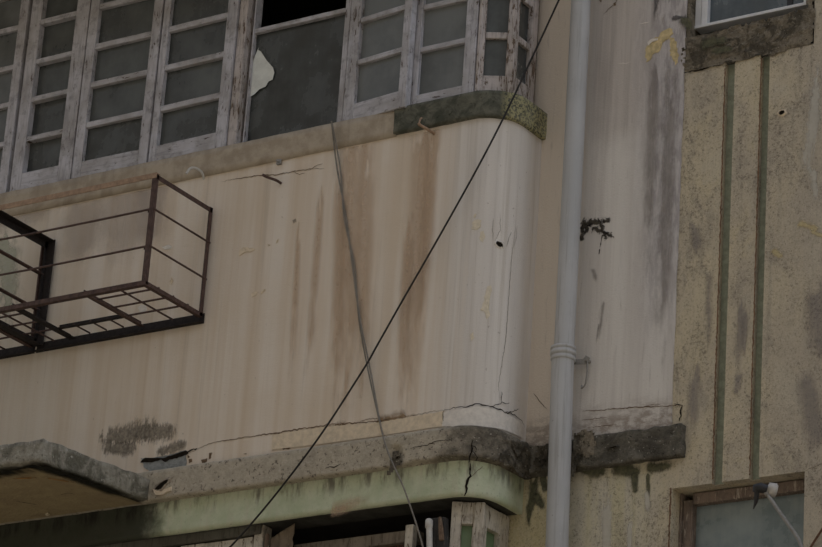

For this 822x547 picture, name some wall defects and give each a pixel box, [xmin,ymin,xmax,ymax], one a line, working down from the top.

leakage [580,218,614,253]
spalling [645,0,816,479]
crack [187,218,523,452]
leakage [100,420,185,456]
crack [464,440,482,496]
spalling [571,429,596,477]